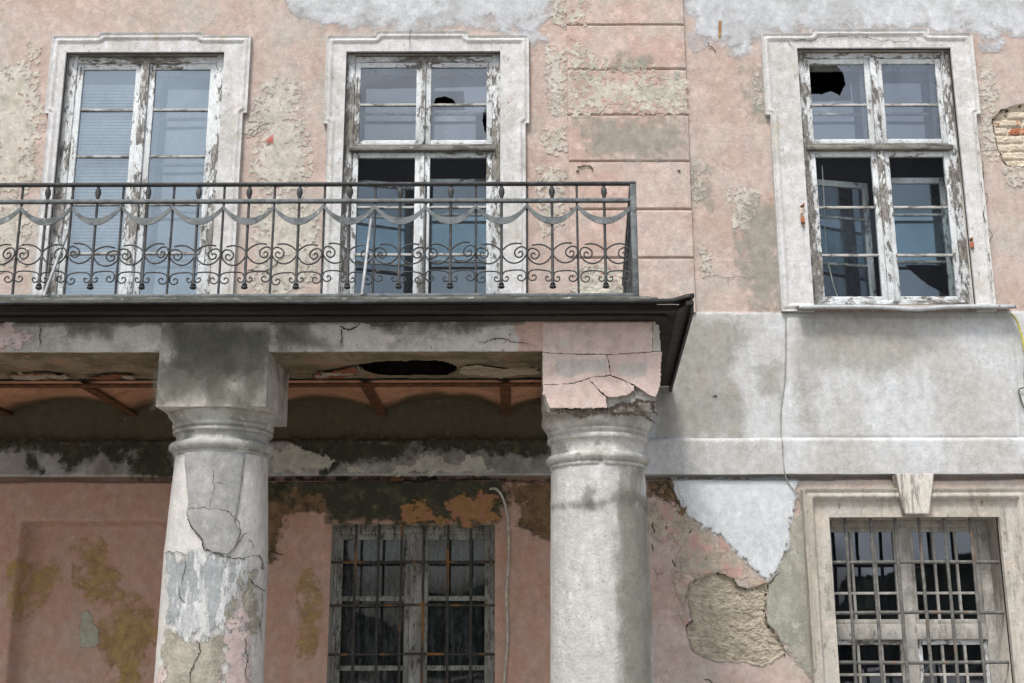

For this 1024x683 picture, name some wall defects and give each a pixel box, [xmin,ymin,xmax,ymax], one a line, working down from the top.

peeling [0,40,45,273]
peeling [243,75,322,294]
peeling [286,0,691,237]
peeling [683,0,1024,57]
spalling [978,65,1024,187]
leakage [0,434,174,481]
crack [164,472,284,679]
peeling [155,443,366,683]
leakage [268,434,549,531]
crack [478,322,662,409]
spalling [646,477,812,679]